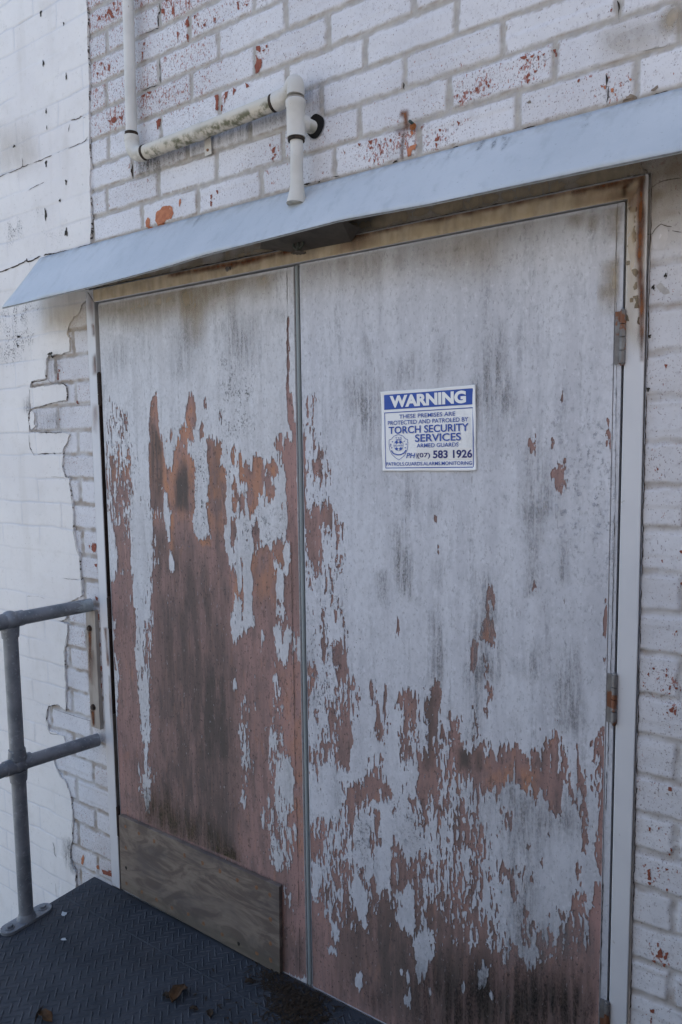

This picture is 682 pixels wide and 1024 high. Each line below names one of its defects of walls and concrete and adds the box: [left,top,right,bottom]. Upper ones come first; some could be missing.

rust [170,251,290,276]
rust [572,176,644,347]
peeling [100,317,605,1024]